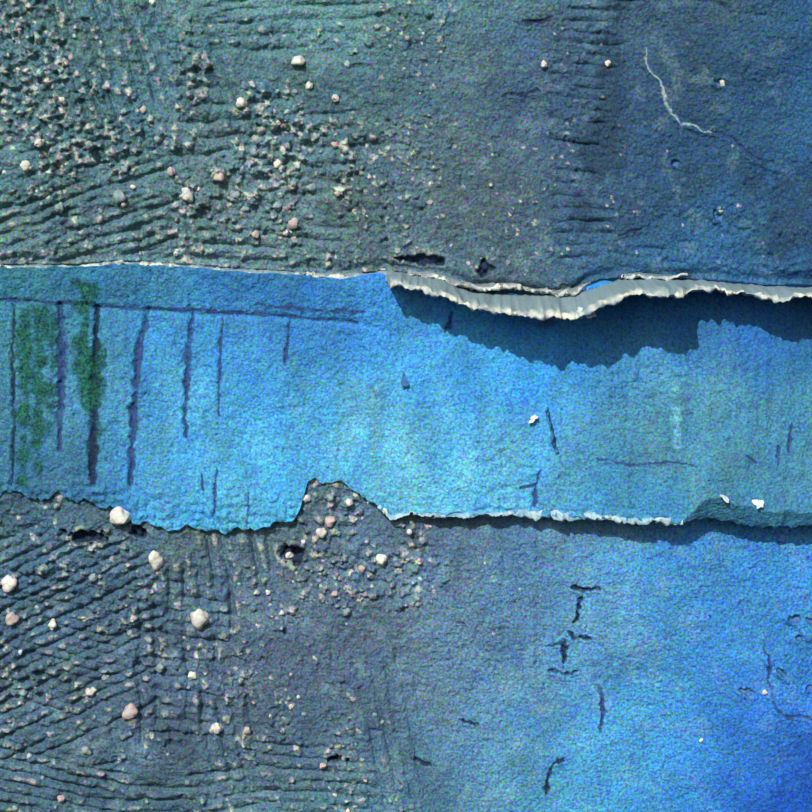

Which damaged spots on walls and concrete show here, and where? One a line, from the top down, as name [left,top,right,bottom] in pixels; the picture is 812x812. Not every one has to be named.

spalling [477,259,494,278]
peeling [529,407,558,452]
spalling [133,525,147,537]
crack [548,585,601,675]
crack [597,688,605,730]
crack [543,758,565,795]